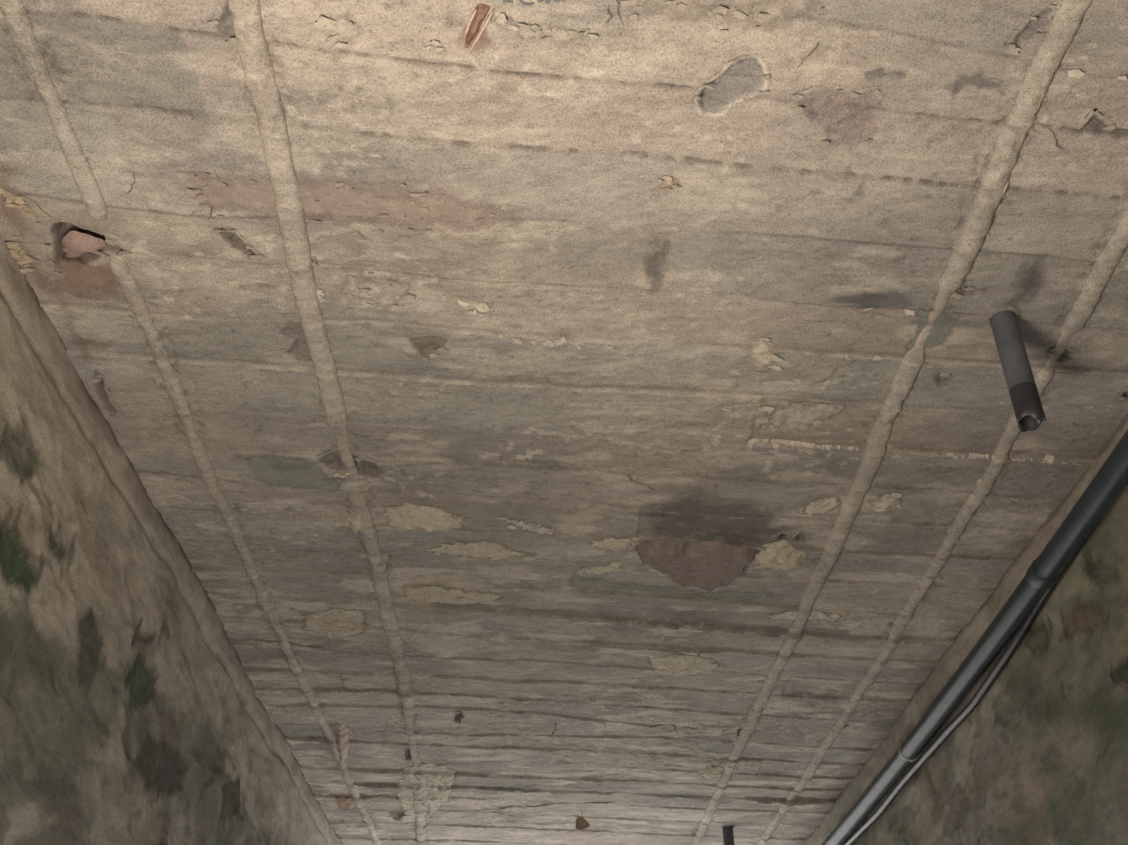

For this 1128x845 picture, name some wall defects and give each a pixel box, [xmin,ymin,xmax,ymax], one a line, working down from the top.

crack [606,0,623,25]
spalling [693,54,770,118]
spalling [0,188,132,278]
crack [754,356,869,434]